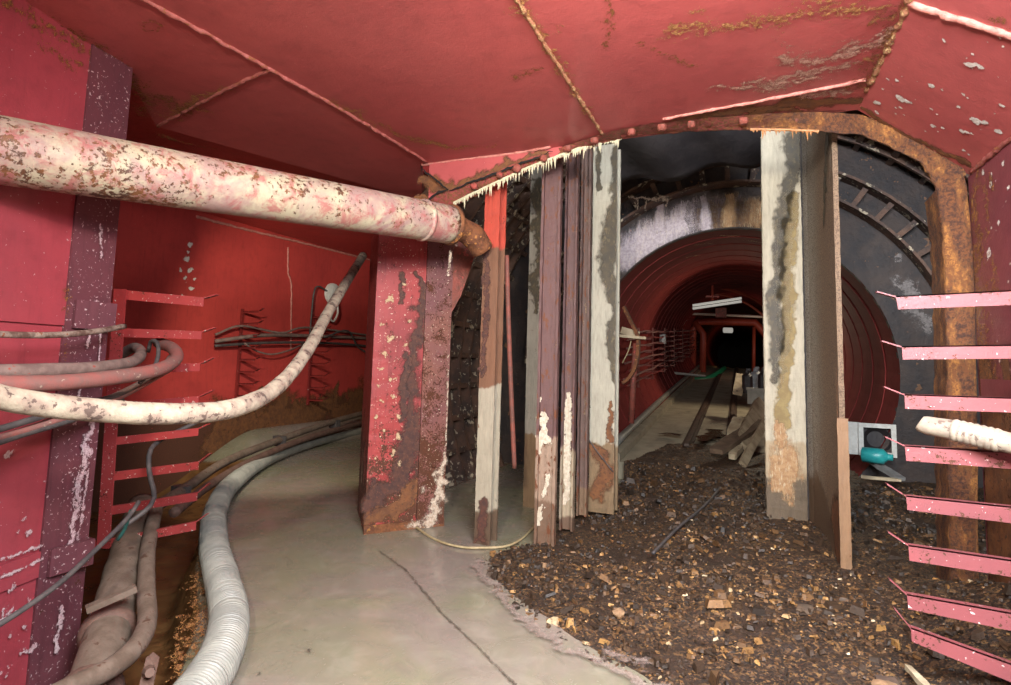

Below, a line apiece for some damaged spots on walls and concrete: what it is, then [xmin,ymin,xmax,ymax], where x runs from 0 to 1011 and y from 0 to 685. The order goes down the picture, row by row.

corrosion [633,0,999,292]
leakage [595,132,801,384]
corrosion [769,132,810,520]
peeling [68,421,95,544]
corrosion [362,271,426,526]
peeling [535,397,552,455]
peeling [537,473,552,526]
peeling [563,392,573,505]
corrosion [589,401,614,503]
corrosion [831,497,840,563]
peeling [53,605,64,655]
crack [379,551,517,685]